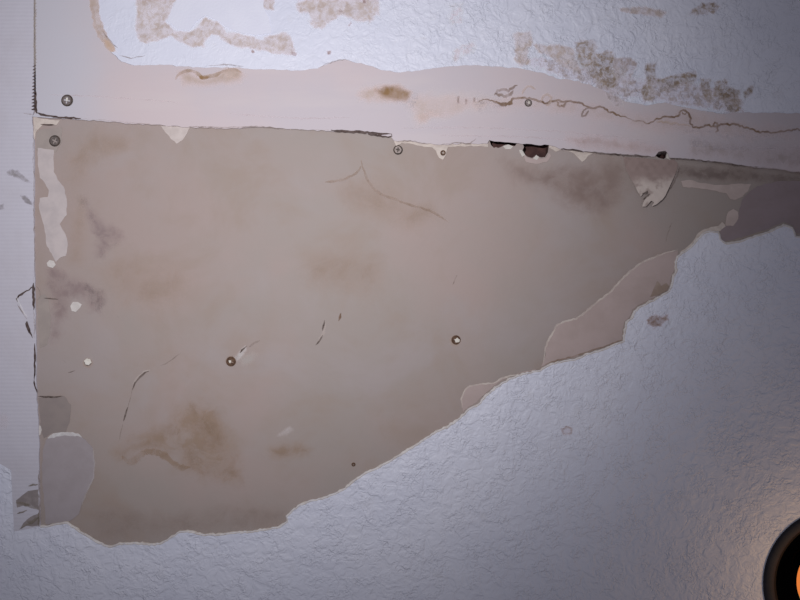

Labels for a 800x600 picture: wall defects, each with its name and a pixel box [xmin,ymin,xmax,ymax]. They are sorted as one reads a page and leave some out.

water stain [135,0,296,55]
water stain [297,0,379,28]
water stain [514,32,754,113]
peeling [16,112,800,548]
crack [122,371,148,426]